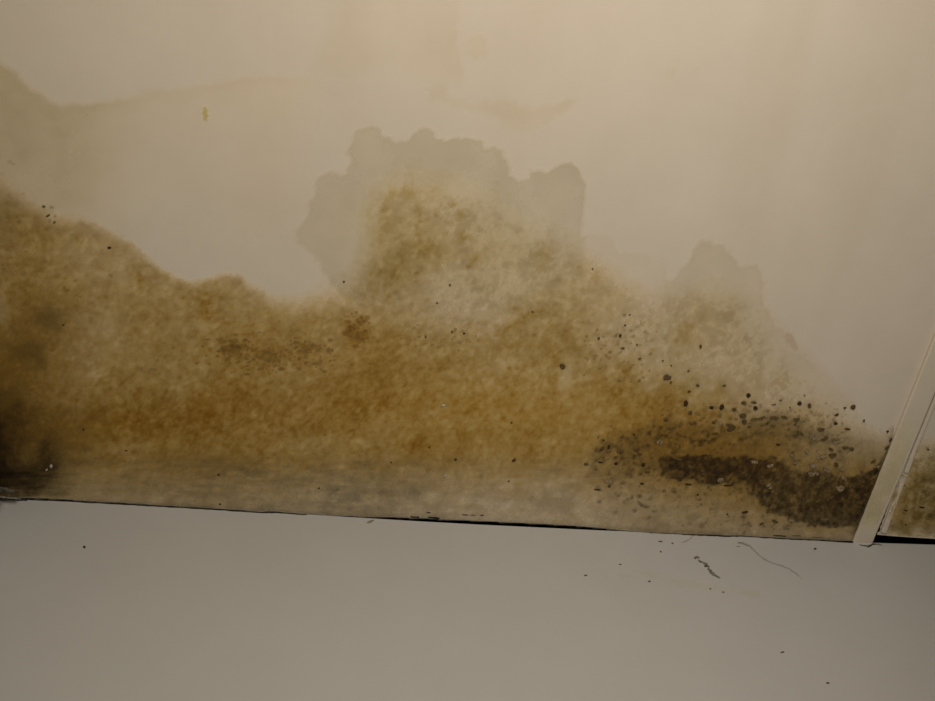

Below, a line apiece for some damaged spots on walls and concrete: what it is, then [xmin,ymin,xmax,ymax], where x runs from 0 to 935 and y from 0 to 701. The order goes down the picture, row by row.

damp [195,334,335,375]
damp [342,311,370,347]
damp [0,303,100,498]
damp [119,459,445,518]
damp [584,384,894,540]
damp [887,446,935,537]